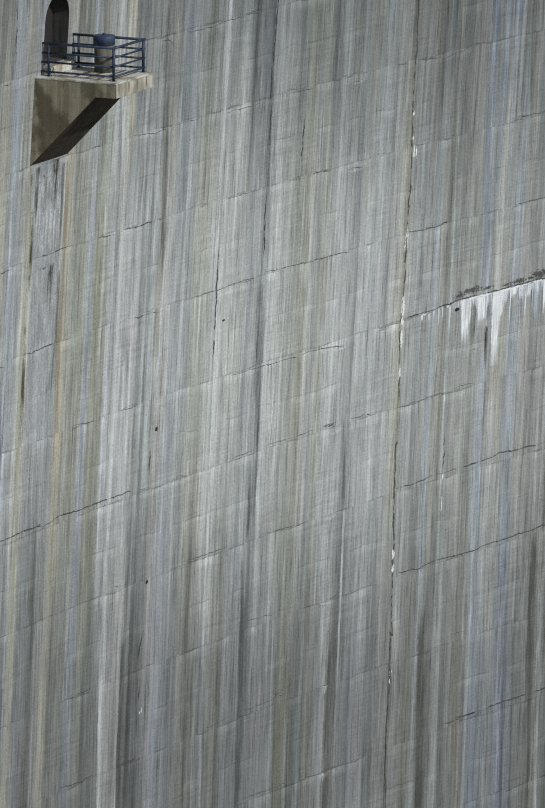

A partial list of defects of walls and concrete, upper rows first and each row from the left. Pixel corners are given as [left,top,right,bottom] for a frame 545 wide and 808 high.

crack [407,278,545,318]
damp [421,269,545,394]
crack [231,346,342,376]